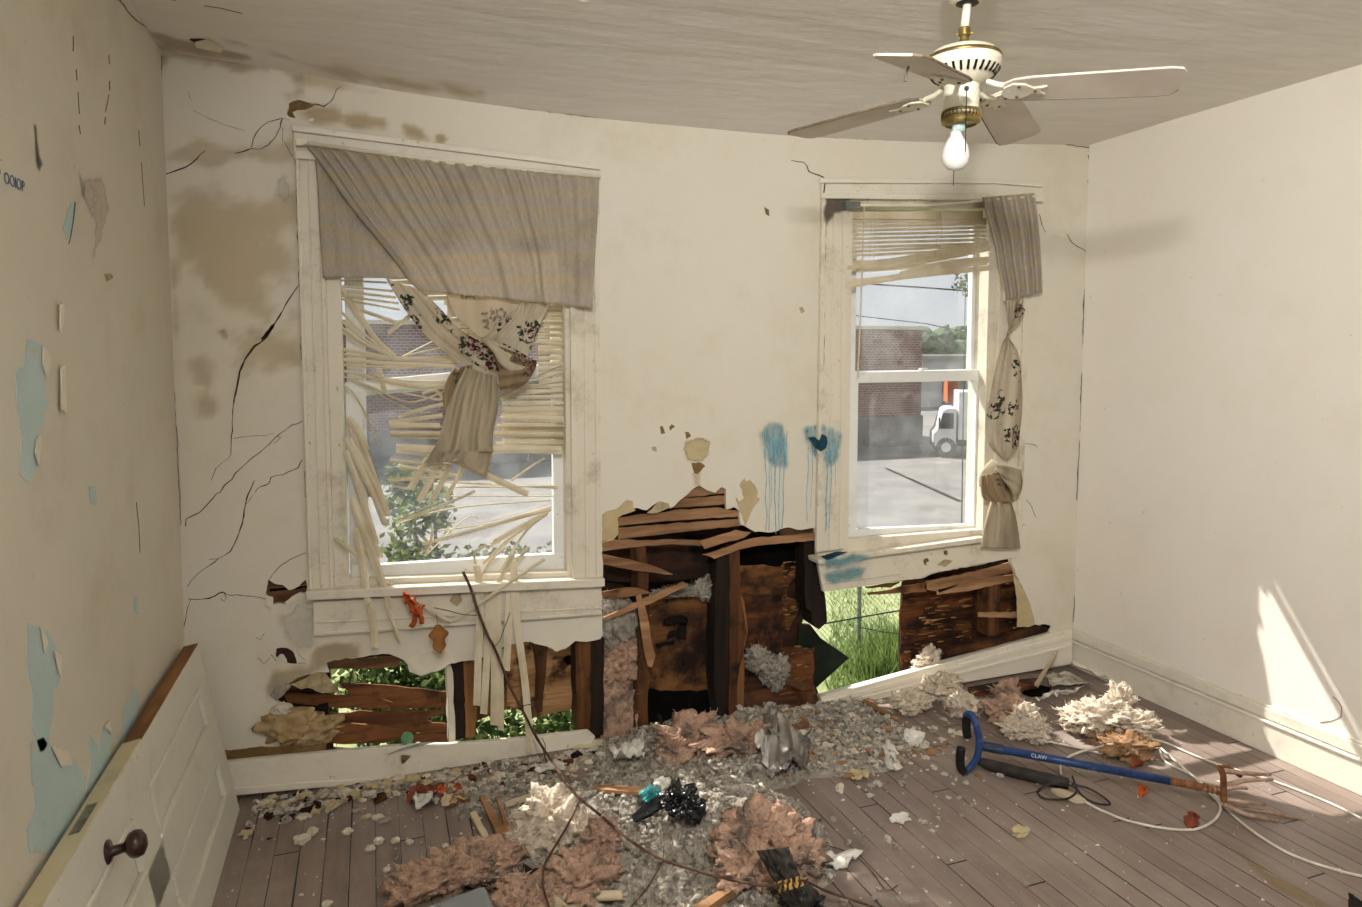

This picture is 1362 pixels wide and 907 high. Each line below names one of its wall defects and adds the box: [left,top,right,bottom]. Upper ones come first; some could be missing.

crack [73,36,110,134]
crack [138,92,293,206]
peeling [15,339,67,483]
crack [175,197,306,625]
spalling [602,500,672,541]
spalling [736,477,760,525]
peeling [924,549,952,567]
spalling [265,580,307,611]
spalling [1013,574,1035,627]
spalling [270,672,342,701]
spalling [407,650,456,675]
peeling [27,623,139,854]